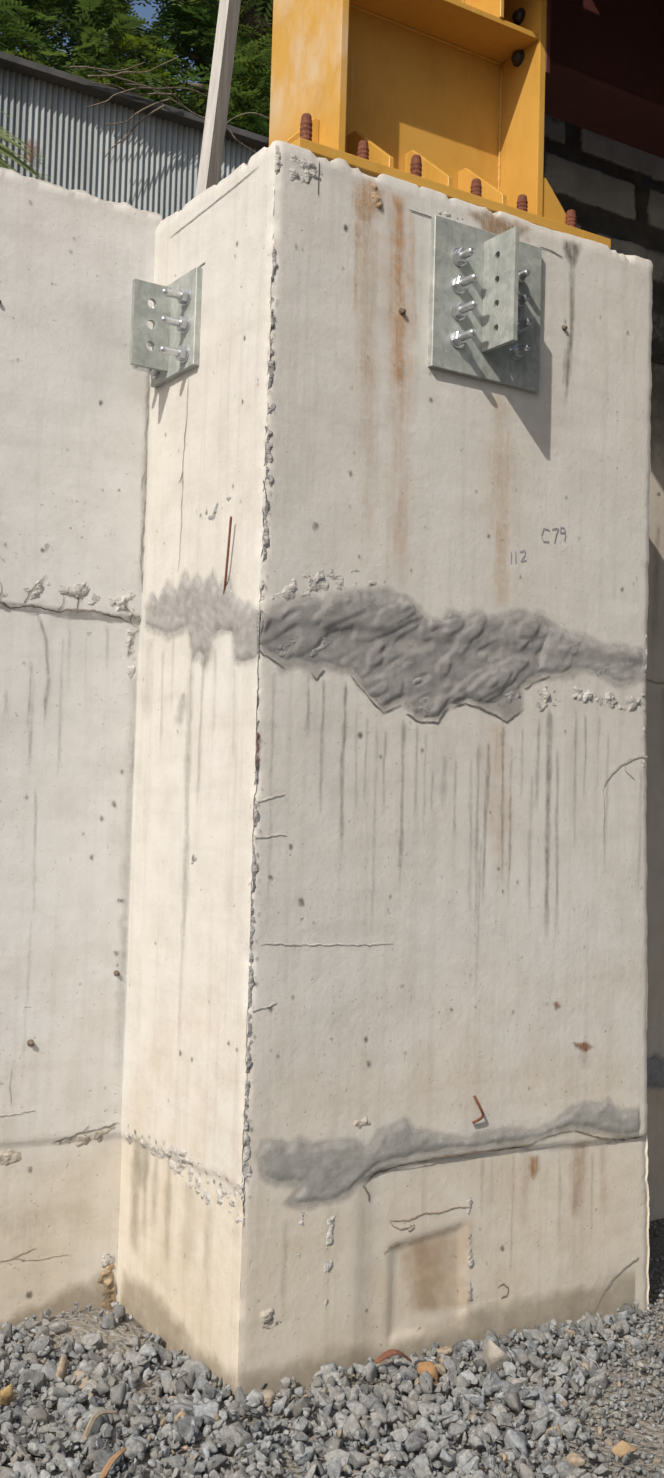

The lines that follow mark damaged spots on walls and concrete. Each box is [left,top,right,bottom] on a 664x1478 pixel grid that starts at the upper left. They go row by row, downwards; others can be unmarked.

crack [0,377,189,657]
spalling [54,677,260,1227]
spalling [0,1148,22,1166]
crack [52,1122,118,1144]